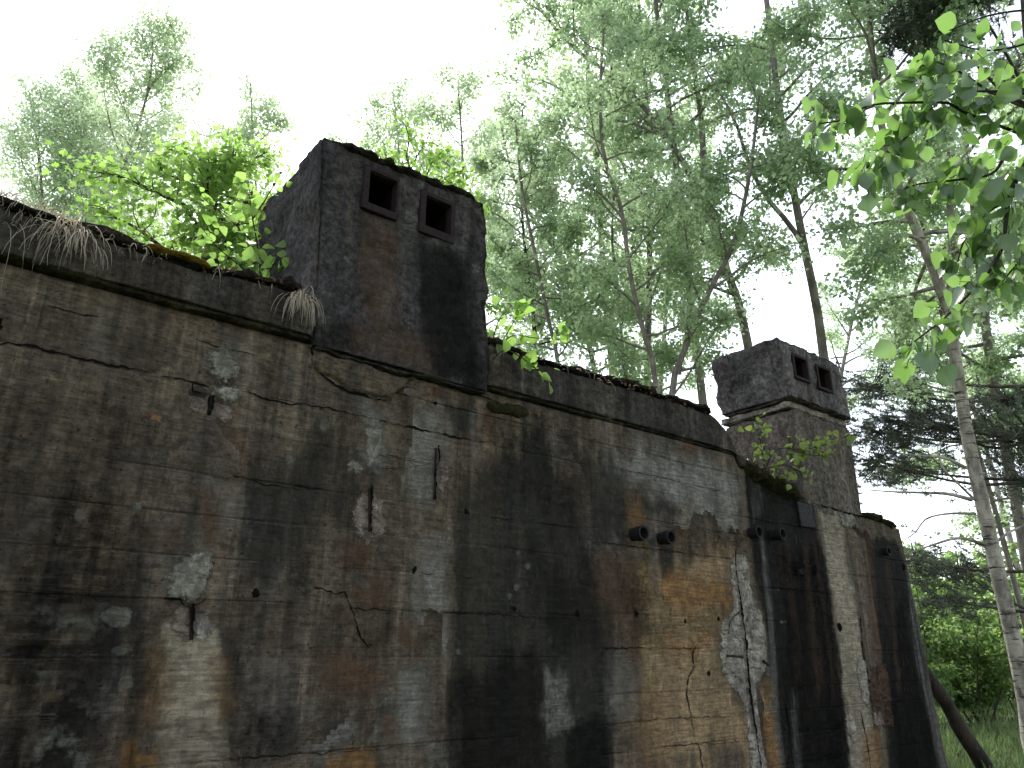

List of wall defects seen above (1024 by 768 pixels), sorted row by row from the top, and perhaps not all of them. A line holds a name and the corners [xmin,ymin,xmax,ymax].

crack [0,341,209,387]
spalling [188,346,243,424]
crack [244,341,495,443]
water stain [412,233,483,388]
spalling [352,485,387,546]
spalling [164,551,216,643]
crack [315,566,589,650]
water stain [375,413,624,768]
crack [602,647,747,767]
spalling [719,550,770,768]
water stain [745,474,849,768]
water stain [852,526,941,768]